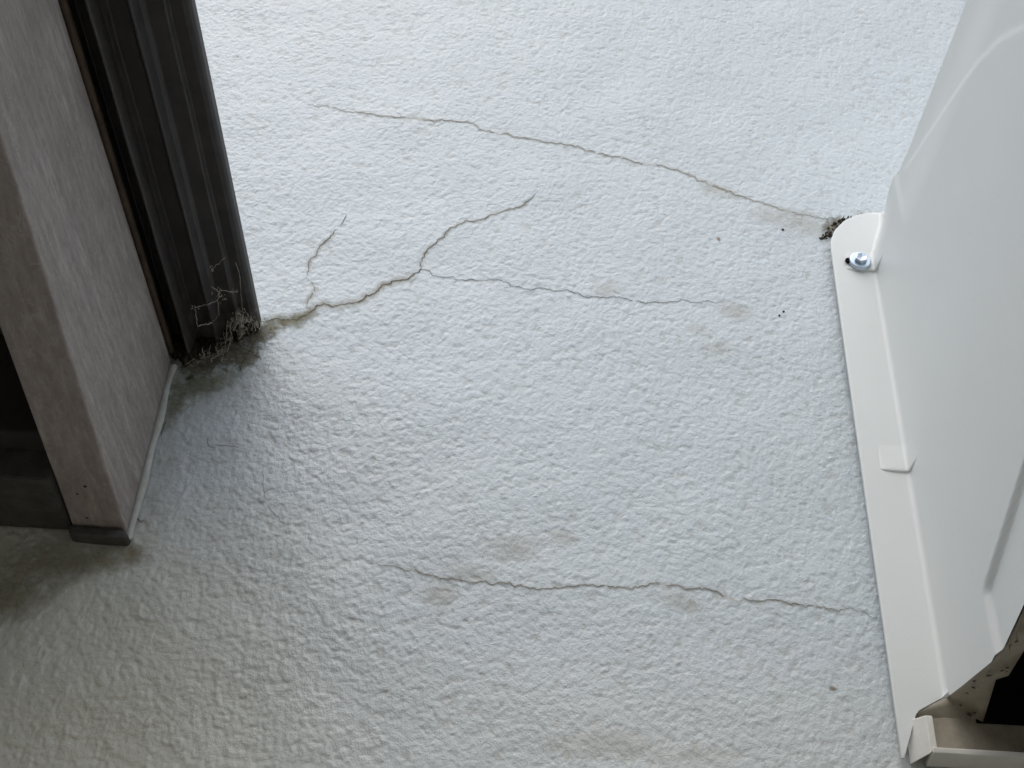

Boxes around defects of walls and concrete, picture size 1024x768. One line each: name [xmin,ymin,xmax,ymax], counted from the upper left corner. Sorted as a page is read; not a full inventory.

leakage [181,326,276,384]
crack [237,191,715,374]